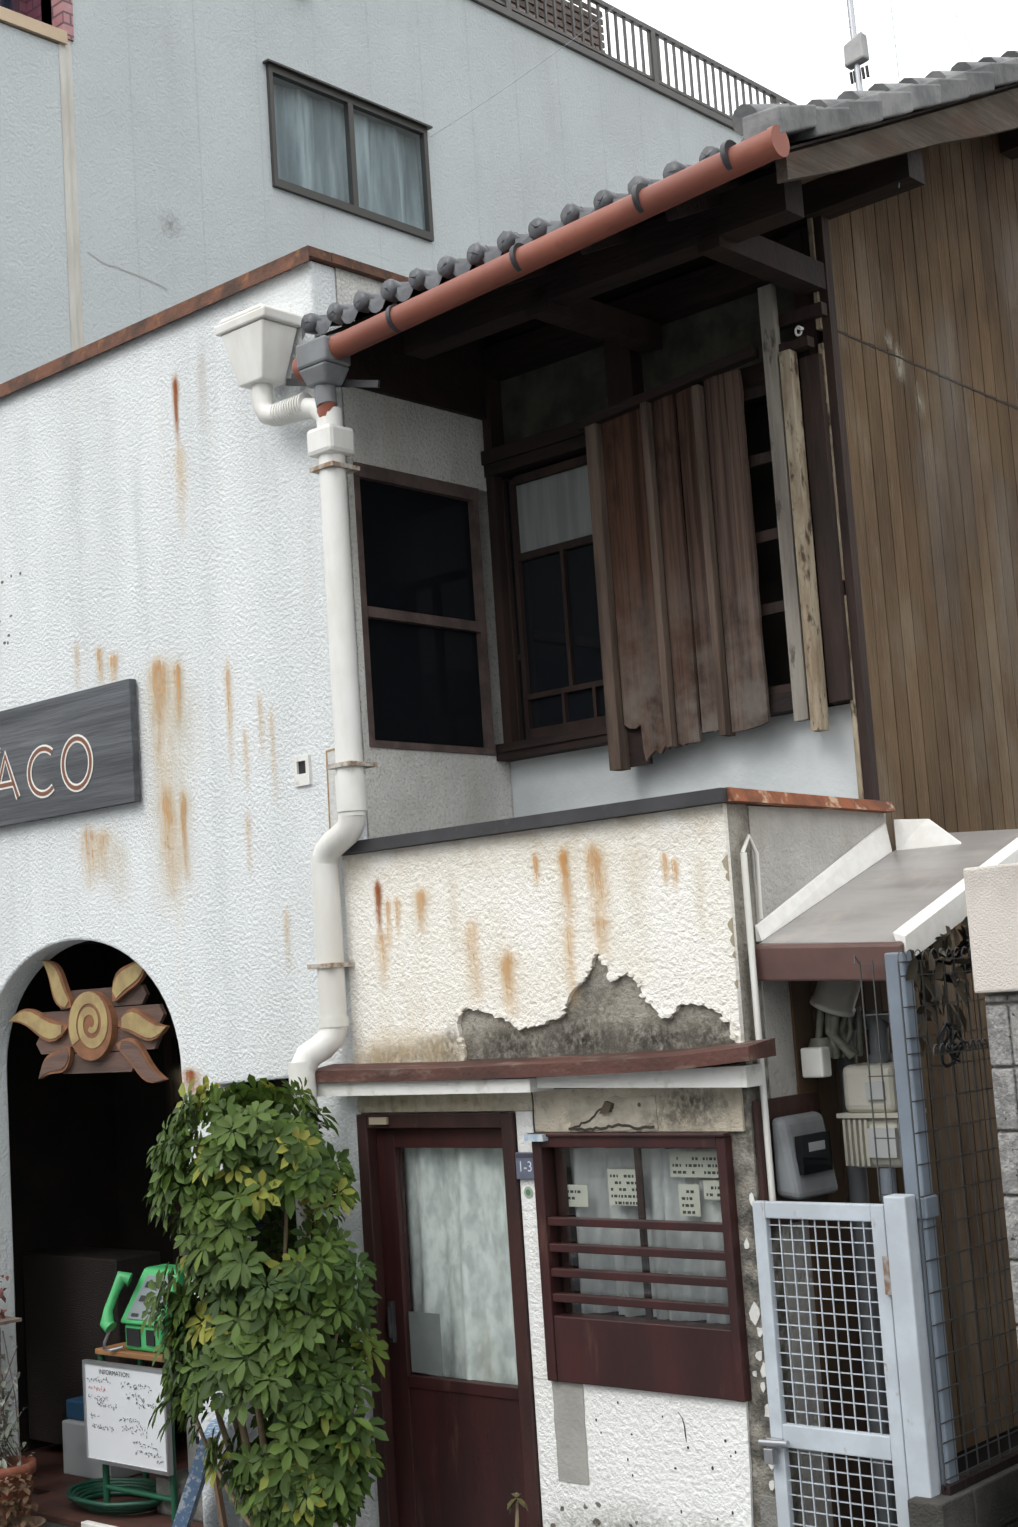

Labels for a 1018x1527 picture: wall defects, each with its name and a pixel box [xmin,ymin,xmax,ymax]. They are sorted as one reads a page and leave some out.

rust [152,661,180,717]
rust [162,795,186,849]
rust [559,849,569,903]
rust [588,848,602,897]
rust [374,881,397,953]
rust [503,955,512,988]
spalling [454,948,743,1061]